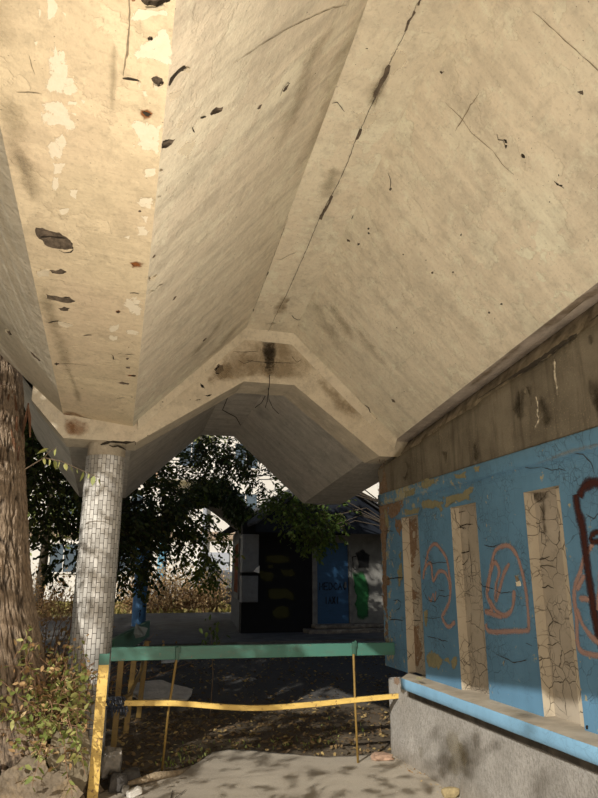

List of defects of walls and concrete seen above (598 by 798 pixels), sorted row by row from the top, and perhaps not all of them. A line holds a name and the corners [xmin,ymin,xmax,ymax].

peeling [130,0,170,21]
crack [536,14,598,71]
spalling [142,76,163,97]
peeling [41,46,85,190]
peeling [131,120,175,155]
crack [253,0,421,331]
crack [451,95,525,175]
spalling [35,228,73,253]
spalling [46,294,75,311]
water stain [217,343,292,377]
crack [389,511,513,647]
crack [496,505,559,665]